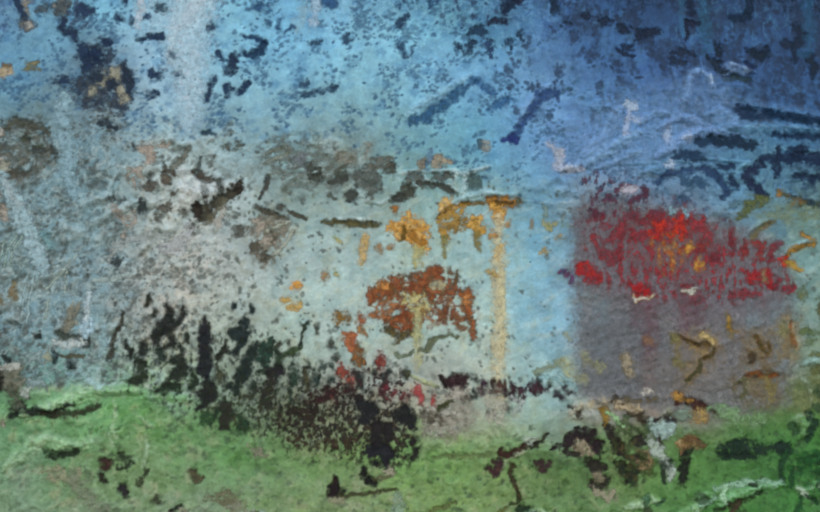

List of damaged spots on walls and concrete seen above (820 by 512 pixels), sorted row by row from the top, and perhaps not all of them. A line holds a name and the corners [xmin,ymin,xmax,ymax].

spalling [115,3,168,26]
peeling [13,0,160,131]
spalling [205,50,252,102]
spalling [108,142,244,238]
spalling [261,134,458,205]
peeling [232,216,295,265]
rust [280,281,302,312]
rust [333,195,521,387]
water stain [52,272,423,472]
rust [378,381,436,409]
crack [729,499,742,512]
crack [794,494,819,512]